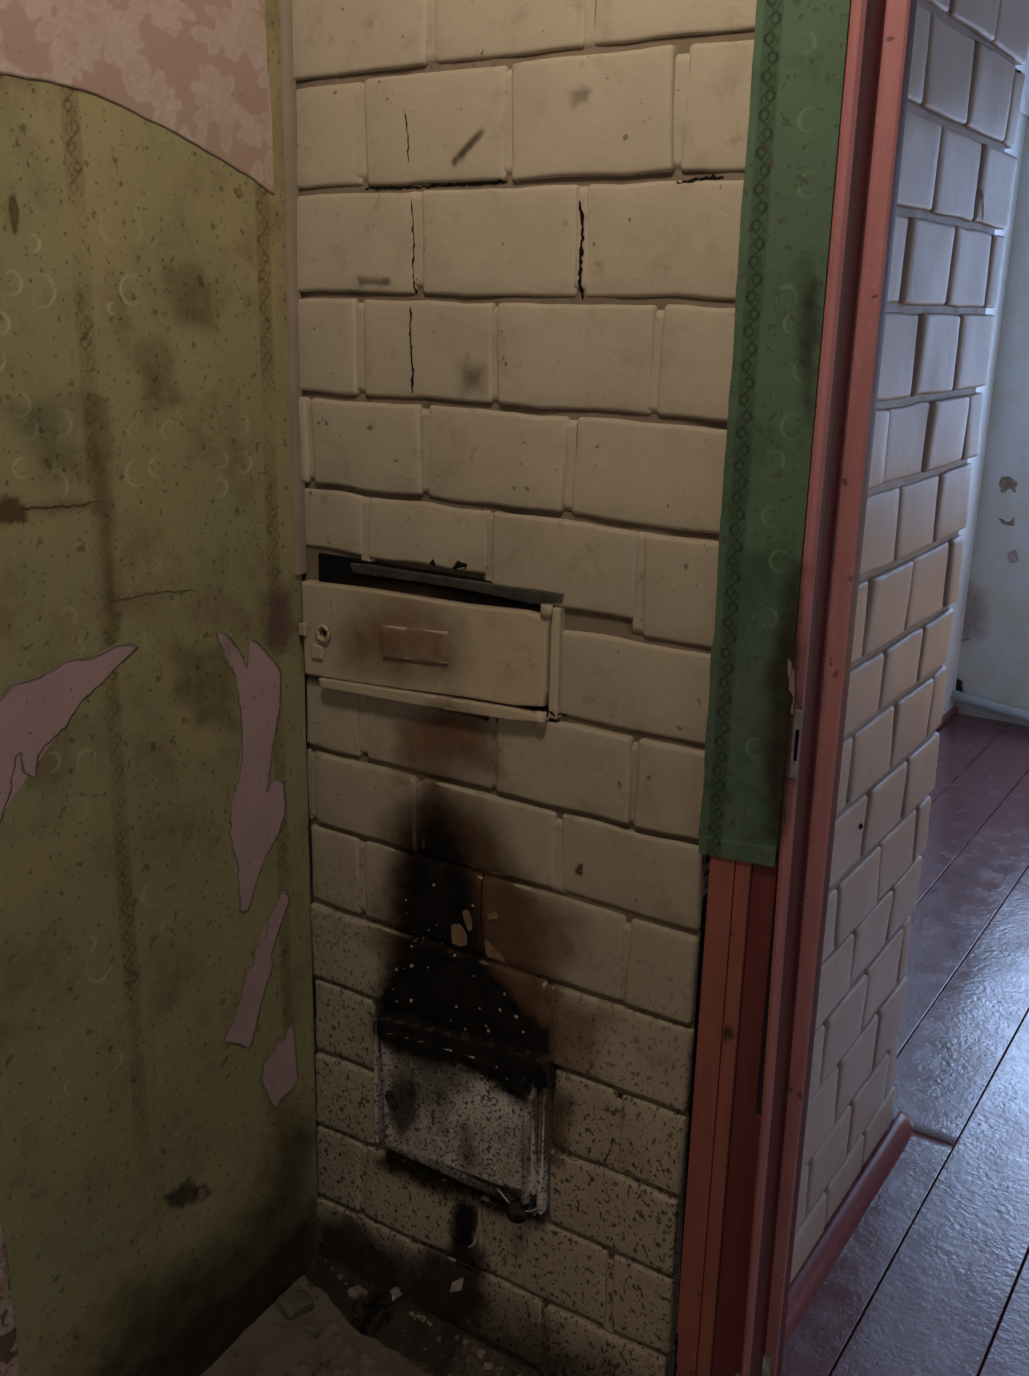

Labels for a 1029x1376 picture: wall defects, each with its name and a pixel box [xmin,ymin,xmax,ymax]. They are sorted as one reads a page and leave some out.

crack [577,201,585,300]